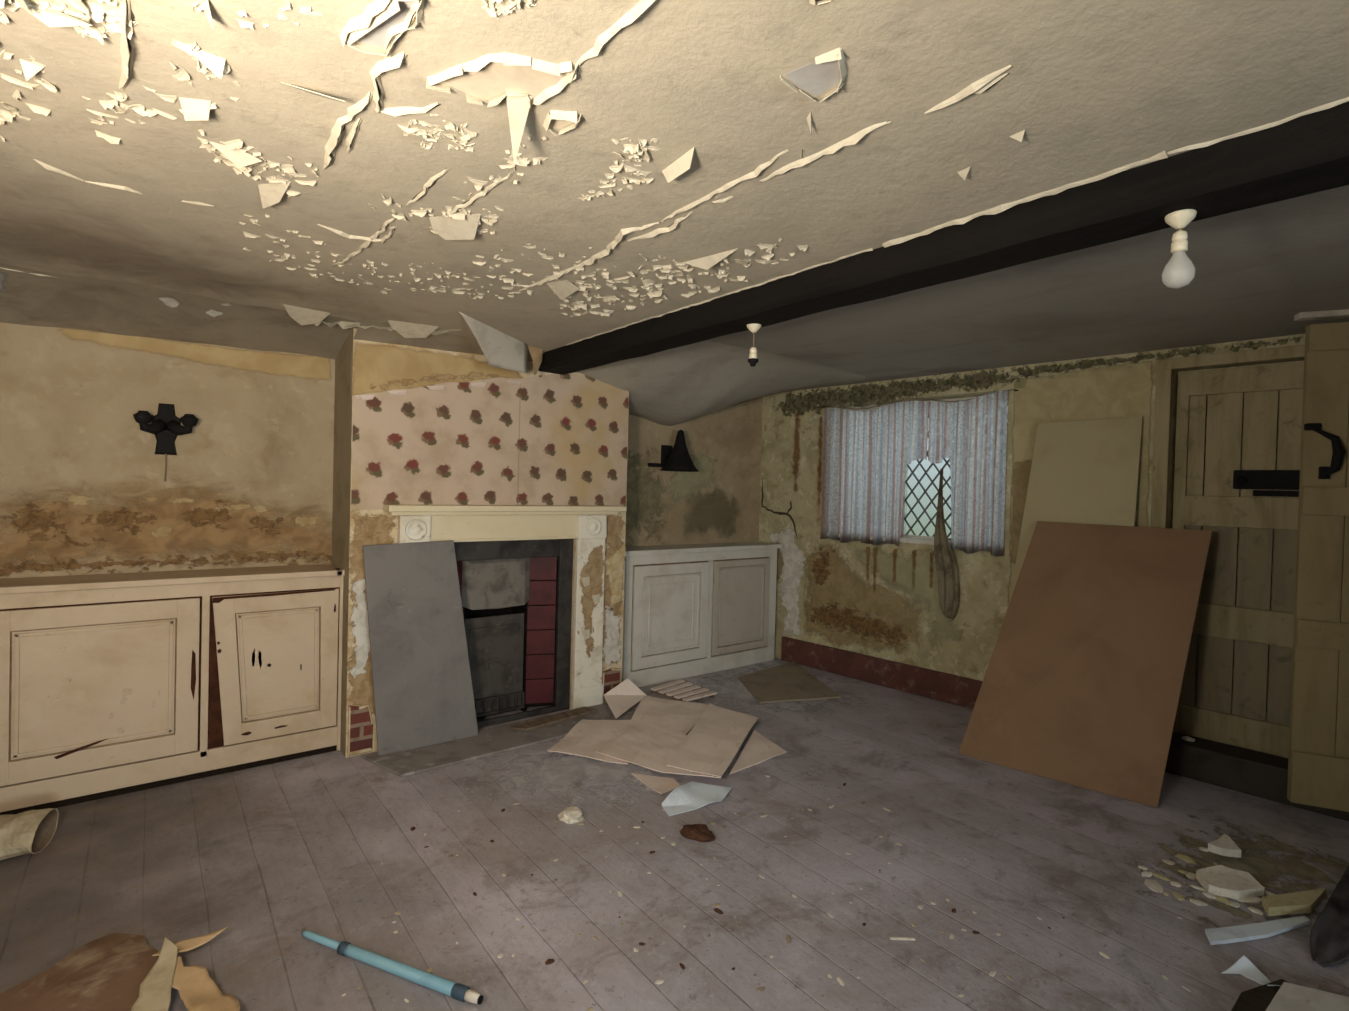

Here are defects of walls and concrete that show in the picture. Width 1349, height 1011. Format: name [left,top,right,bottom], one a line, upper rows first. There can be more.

peeling [0,0,133,45]
peeling [192,0,214,29]
peeling [235,1,323,30]
peeling [339,0,424,58]
peeling [481,0,538,17]
peeling [0,49,57,142]
peeling [82,39,1349,346]
leakage [0,487,332,576]
flaking render [347,514,397,757]
peeling [580,516,626,698]
leakage [804,545,963,653]